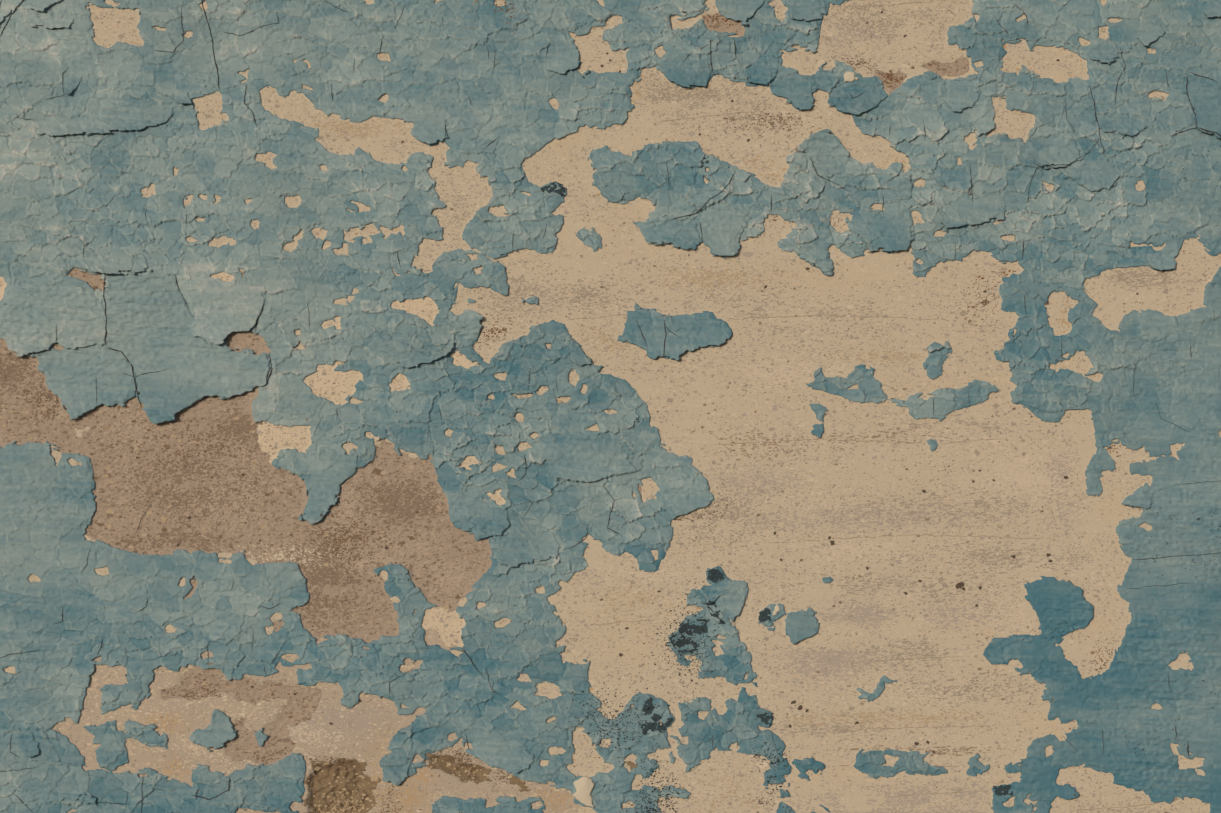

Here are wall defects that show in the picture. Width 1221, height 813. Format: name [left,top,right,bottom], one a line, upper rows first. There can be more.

peeling [183,194,221,222]
crack [154,0,279,126]
peeling [255,151,277,170]
crack [1028,48,1126,200]
crack [1165,69,1221,137]
crack [103,278,166,409]
crack [255,306,272,386]
flaking render [0,252,510,657]
peeling [259,0,1221,813]
flaking render [162,667,321,765]
crack [99,781,143,813]
crack [193,778,230,800]